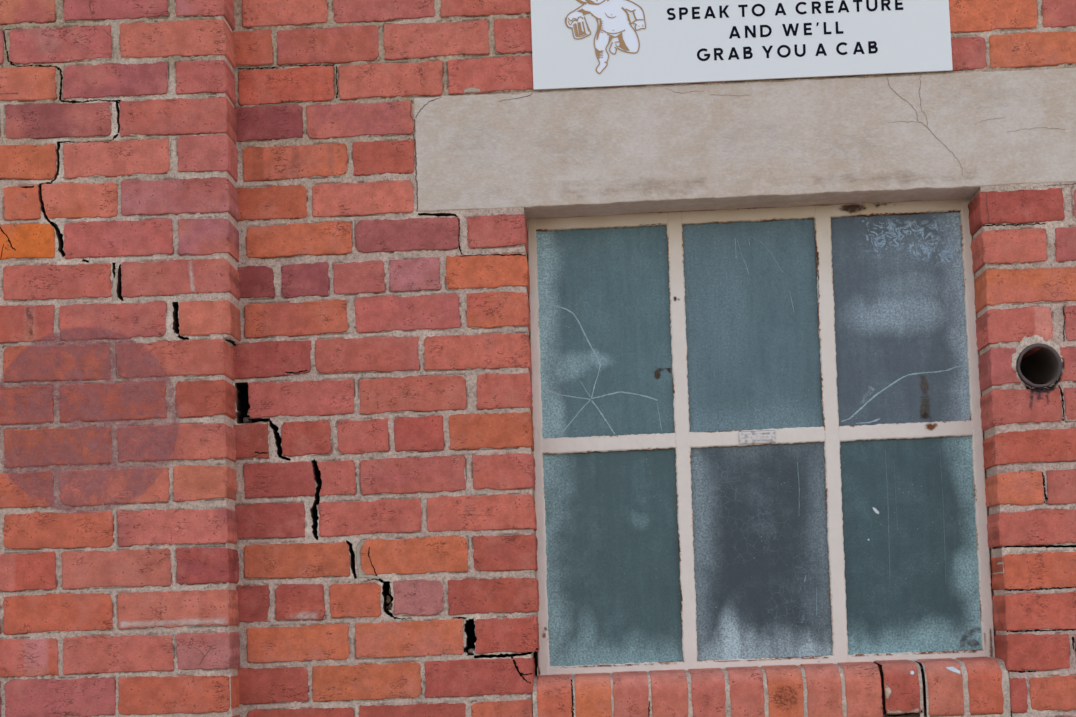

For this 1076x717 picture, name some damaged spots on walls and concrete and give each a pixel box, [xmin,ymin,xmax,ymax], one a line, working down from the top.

crack [238,64,338,98]
crack [4,29,124,301]
crack [406,97,526,257]
crack [172,302,189,340]
crack [235,382,322,540]
crack [346,540,408,620]
crack [453,617,538,684]